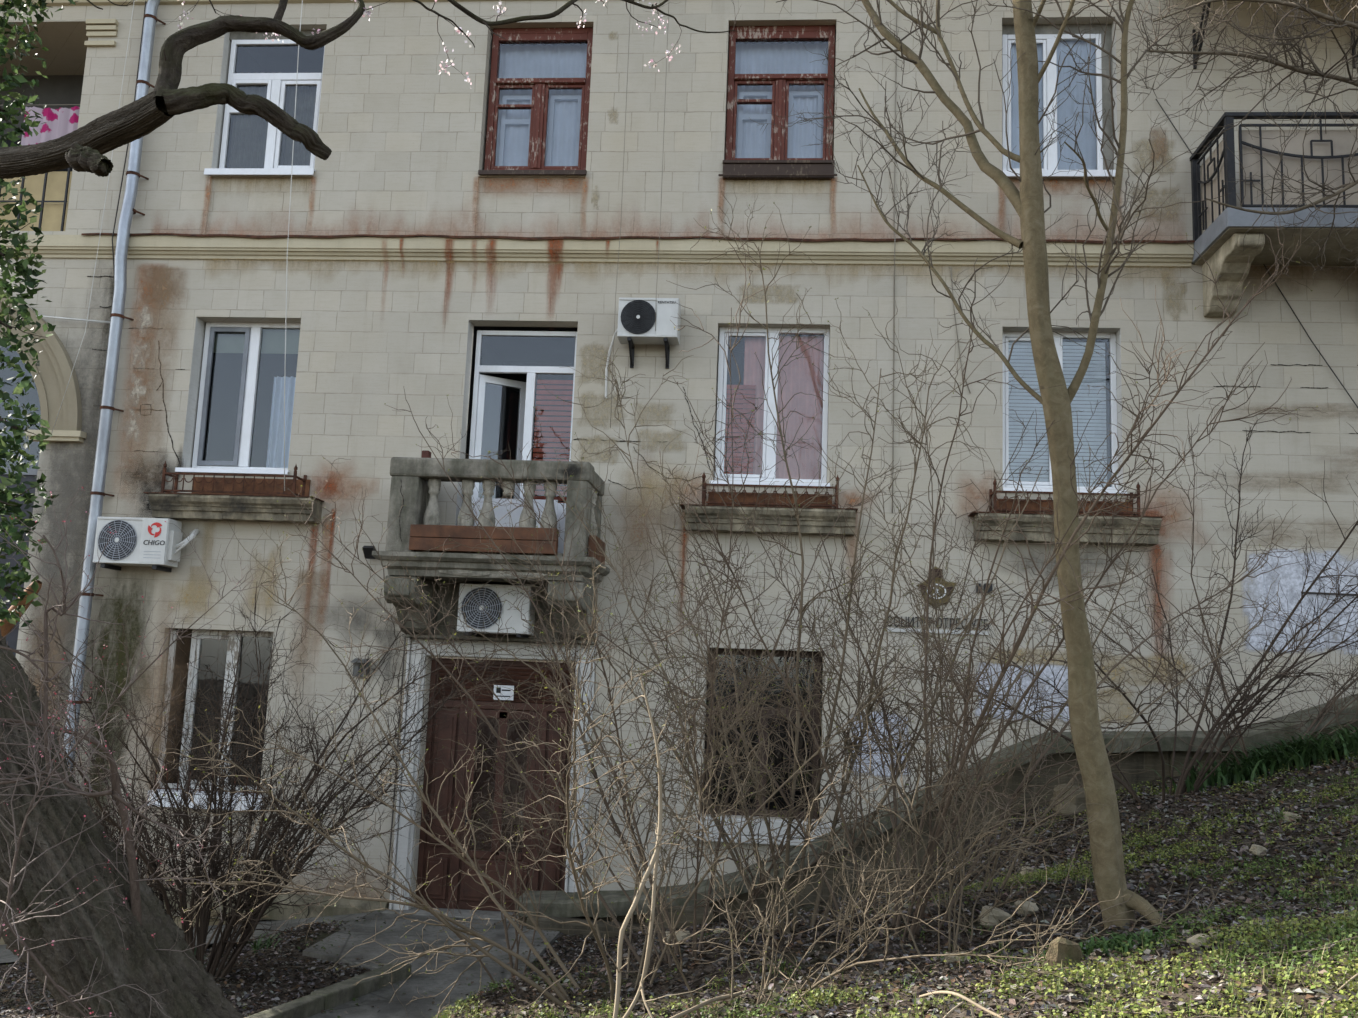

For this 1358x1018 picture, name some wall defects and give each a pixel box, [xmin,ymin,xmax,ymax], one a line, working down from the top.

rust [390,232,458,287]
rust [548,239,563,278]
rust [303,475,353,595]